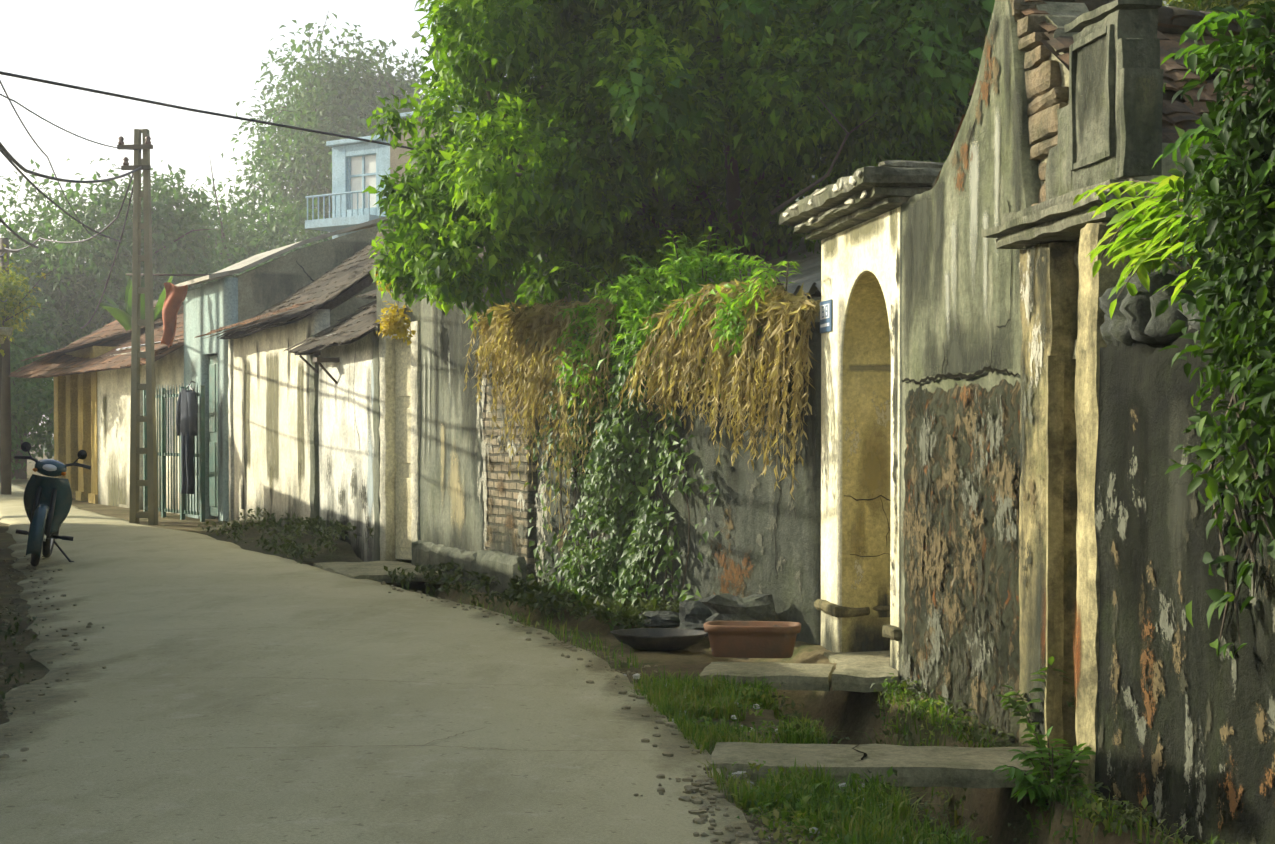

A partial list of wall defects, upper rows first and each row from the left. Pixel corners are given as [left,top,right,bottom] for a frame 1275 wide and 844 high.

water stain [825,18,1025,551]
crack [902,255,1020,385]
water stain [1016,248,1047,345]
water stain [240,327,336,526]
water stain [327,352,374,562]
spalling [872,243,1045,744]
spalling [1094,409,1146,571]
water stain [1027,533,1045,735]
spalling [1098,560,1244,839]
spalling [1248,559,1275,632]
spalling [1254,694,1275,804]